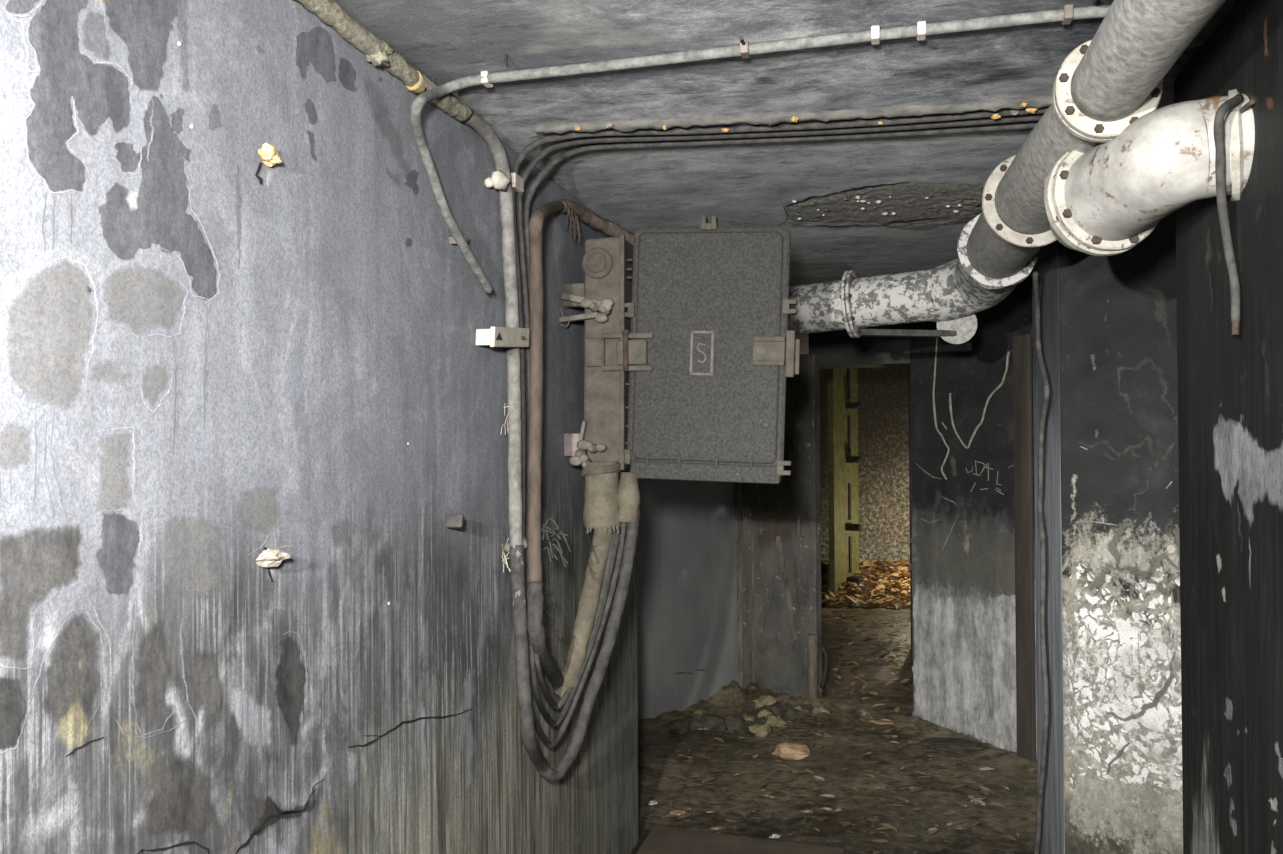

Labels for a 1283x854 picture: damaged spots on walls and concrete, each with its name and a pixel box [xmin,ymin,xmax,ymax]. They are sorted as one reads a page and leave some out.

water stain [296,26,418,194]
water stain [0,0,220,754]
peeling [1213,416,1283,589]
water stain [97,427,308,744]
water stain [145,759,214,835]
crack [137,778,325,854]
water stain [244,789,328,854]
crack [349,709,471,747]
water stain [417,706,426,770]
water stain [459,668,473,790]